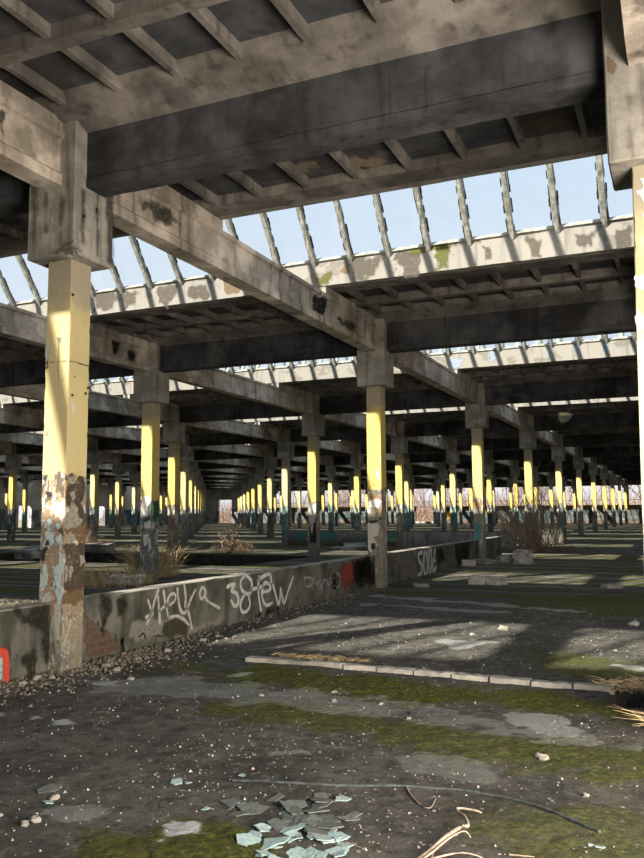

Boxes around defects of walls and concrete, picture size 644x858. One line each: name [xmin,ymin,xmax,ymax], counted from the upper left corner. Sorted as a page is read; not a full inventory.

damp [143,202,176,225]
peeling [634,275,644,290]
peeling [635,311,644,330]
peeling [0,474,308,660]